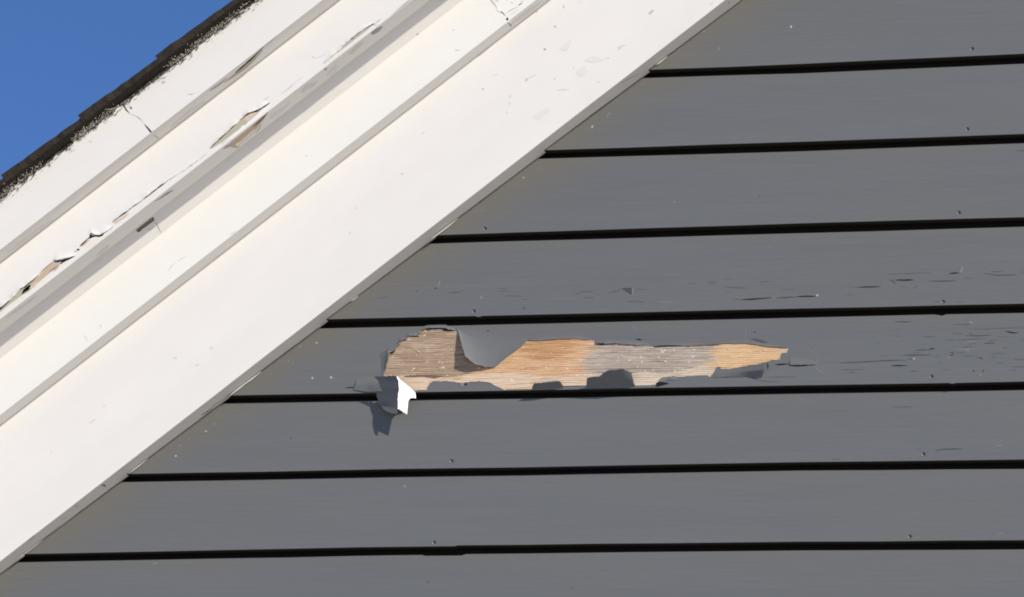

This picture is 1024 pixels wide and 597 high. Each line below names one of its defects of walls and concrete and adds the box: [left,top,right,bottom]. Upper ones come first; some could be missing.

crack [80,19,381,246]
peeling [208,100,270,148]
peeling [0,186,165,316]
peeling [354,324,788,392]